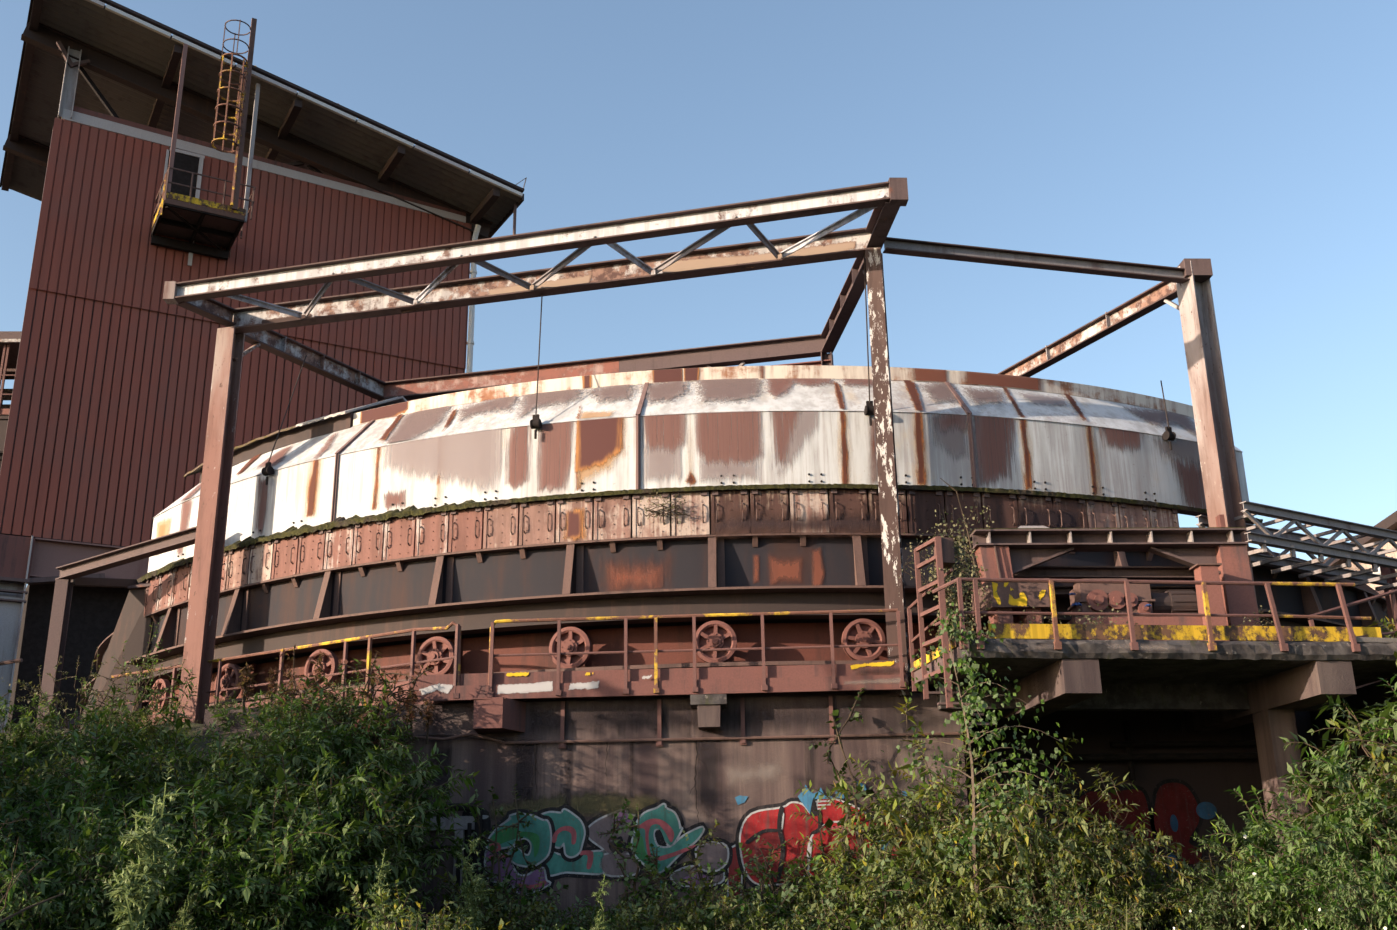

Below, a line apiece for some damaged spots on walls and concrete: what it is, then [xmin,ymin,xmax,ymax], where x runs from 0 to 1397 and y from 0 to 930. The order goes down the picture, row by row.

rust [582,375,592,388]
rust [575,406,624,490]
rust [834,382,848,484]
rust [904,368,947,485]
rust [966,371,1041,490]
rust [1065,394,1099,495]
rust [565,508,586,541]
rust [607,563,663,592]
rust [753,549,824,585]
damp [490,705,867,819]